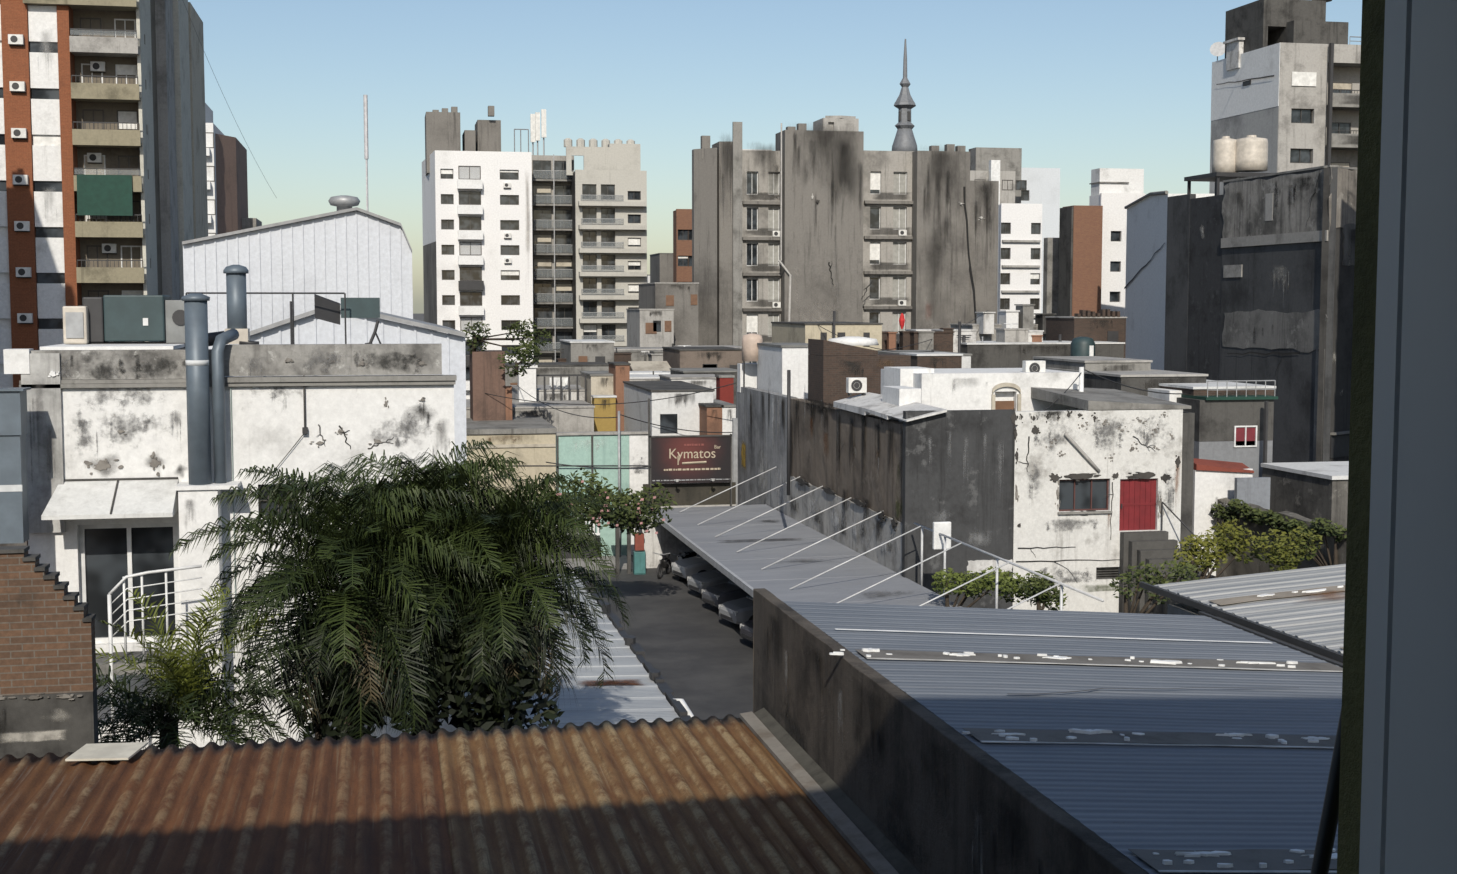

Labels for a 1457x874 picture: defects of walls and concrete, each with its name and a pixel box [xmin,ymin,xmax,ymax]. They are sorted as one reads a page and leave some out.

leakage [79,360,185,446]
leakage [355,353,421,369]
leakage [382,404,443,446]
peeling [1010,408,1181,519]